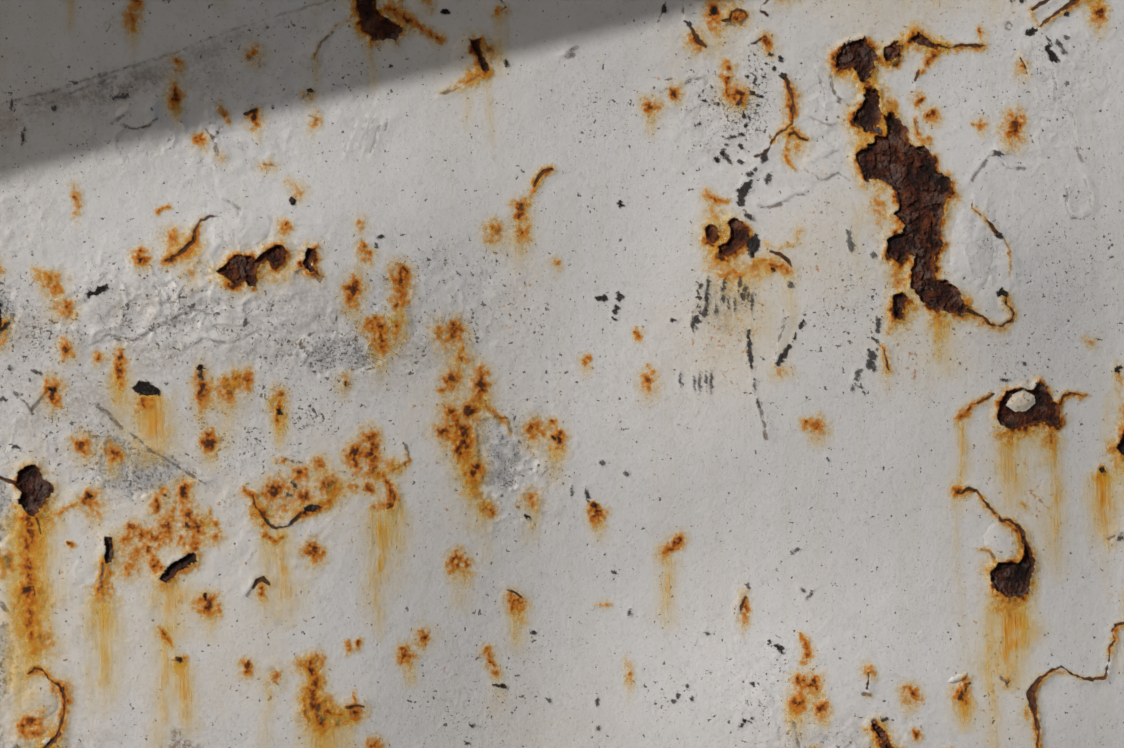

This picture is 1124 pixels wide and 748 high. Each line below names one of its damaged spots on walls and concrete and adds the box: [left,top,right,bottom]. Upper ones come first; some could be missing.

rust [346,0,446,48]
rust [216,220,324,292]
rust [701,189,801,288]
rust [828,26,1017,373]
rust [433,318,567,520]
rust [955,378,1088,480]
rust [0,463,104,660]
rust [93,478,222,627]
rust [242,430,411,601]
rust [951,472,1037,686]
rust [296,653,364,748]
crack [1024,622,1124,748]